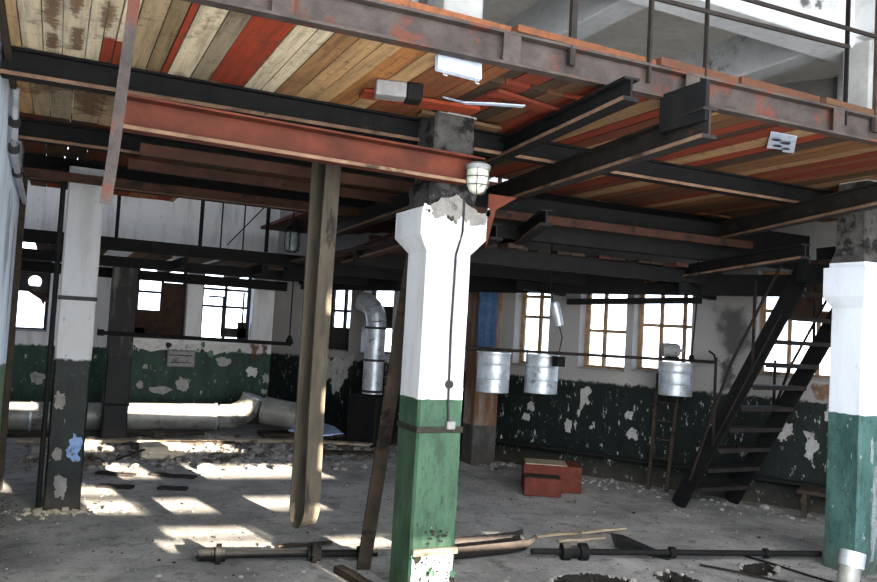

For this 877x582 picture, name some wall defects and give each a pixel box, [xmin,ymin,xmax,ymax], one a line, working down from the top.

leakage [42,0,84,51]
leakage [100,0,117,28]
spalling [423,191,491,226]
peeling [133,339,268,367]
peeling [54,391,66,409]
peeling [136,377,189,395]
peeling [246,366,269,394]
peeling [564,386,592,433]
peeling [625,411,638,441]
peeling [51,433,83,462]
peeling [53,473,67,500]
peeling [410,554,456,582]